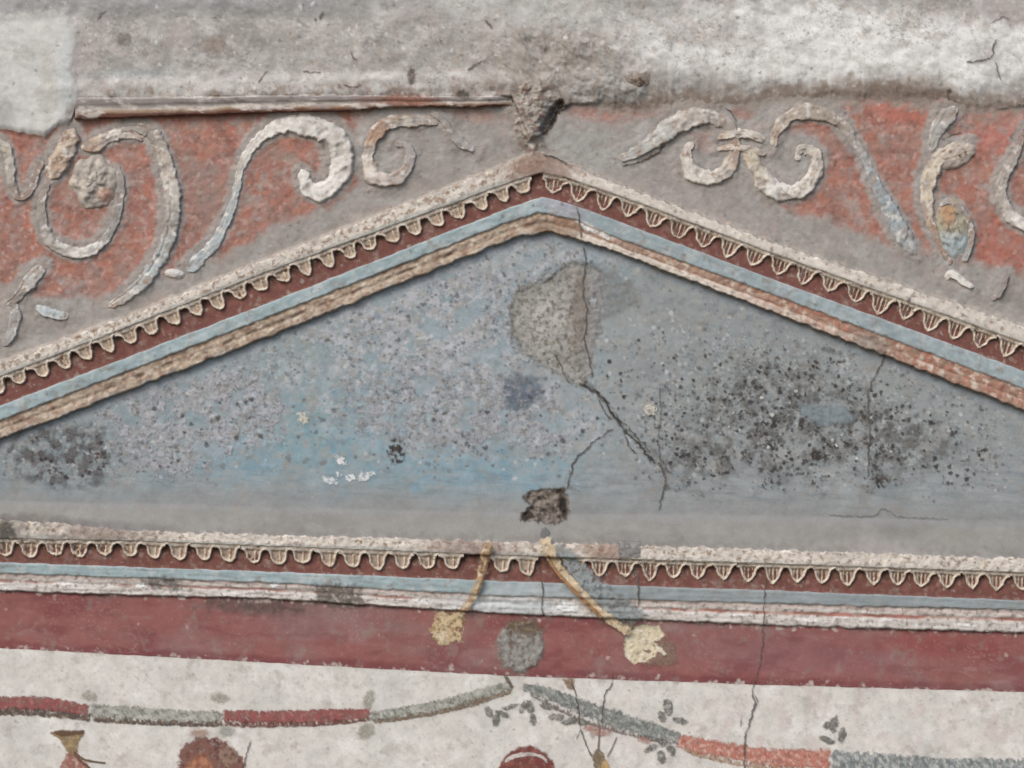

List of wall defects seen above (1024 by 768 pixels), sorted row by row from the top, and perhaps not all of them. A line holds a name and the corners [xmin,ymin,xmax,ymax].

spalling [545,101,567,135]
leakage [22,372,283,484]
spalling [508,261,606,386]
crack [555,210,671,509]
leakage [648,347,975,490]
crack [867,351,886,476]
spalling [521,487,570,538]
crack [740,571,766,768]